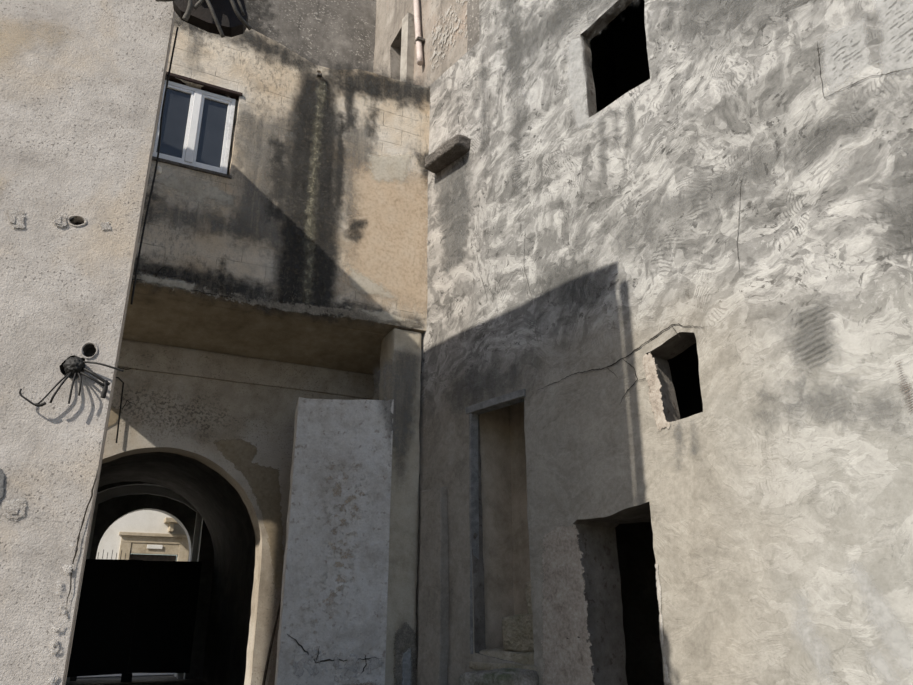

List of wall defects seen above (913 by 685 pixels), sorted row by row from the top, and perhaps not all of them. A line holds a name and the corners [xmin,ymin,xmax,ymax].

leakage [131,0,430,327]
crack [538,323,703,403]
peeling [213,439,284,685]
crack [287,634,380,672]
spalling [393,622,418,685]